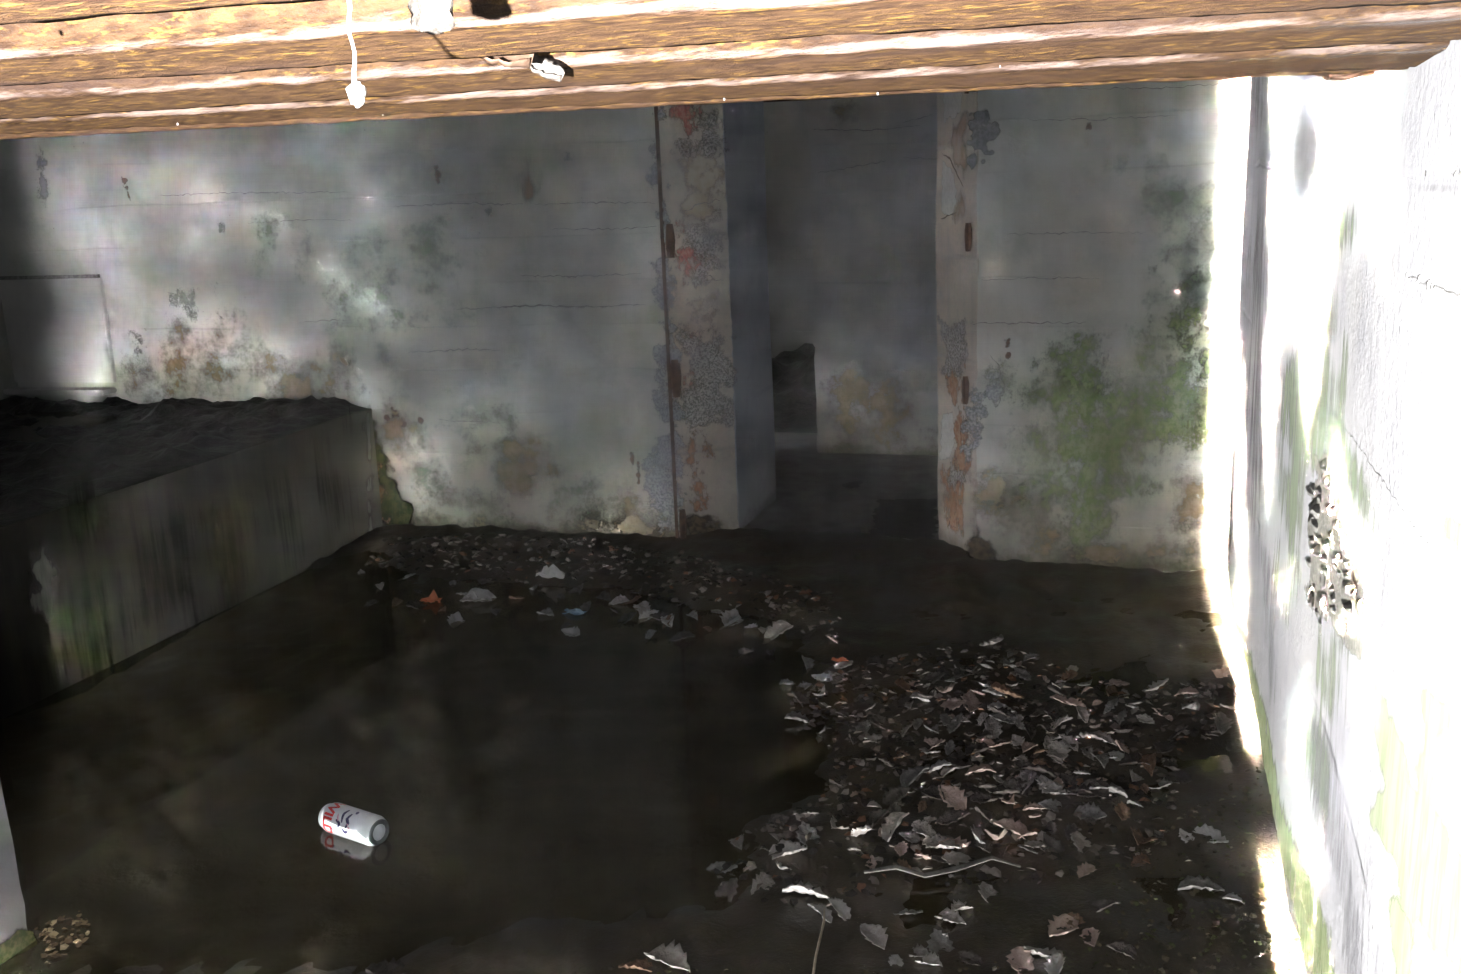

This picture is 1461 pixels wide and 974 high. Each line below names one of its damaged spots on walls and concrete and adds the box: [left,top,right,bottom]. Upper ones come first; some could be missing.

peeling [941,92,1000,215]
water stain [131,289,196,395]
water stain [204,316,233,382]
water stain [257,346,351,400]
spalling [641,144,687,534]
spalling [939,368,1004,462]
water stain [566,496,666,537]
water stain [1030,481,1225,564]
spalling [1304,451,1366,660]
crack [1332,413,1442,562]
water stain [1390,898,1413,974]